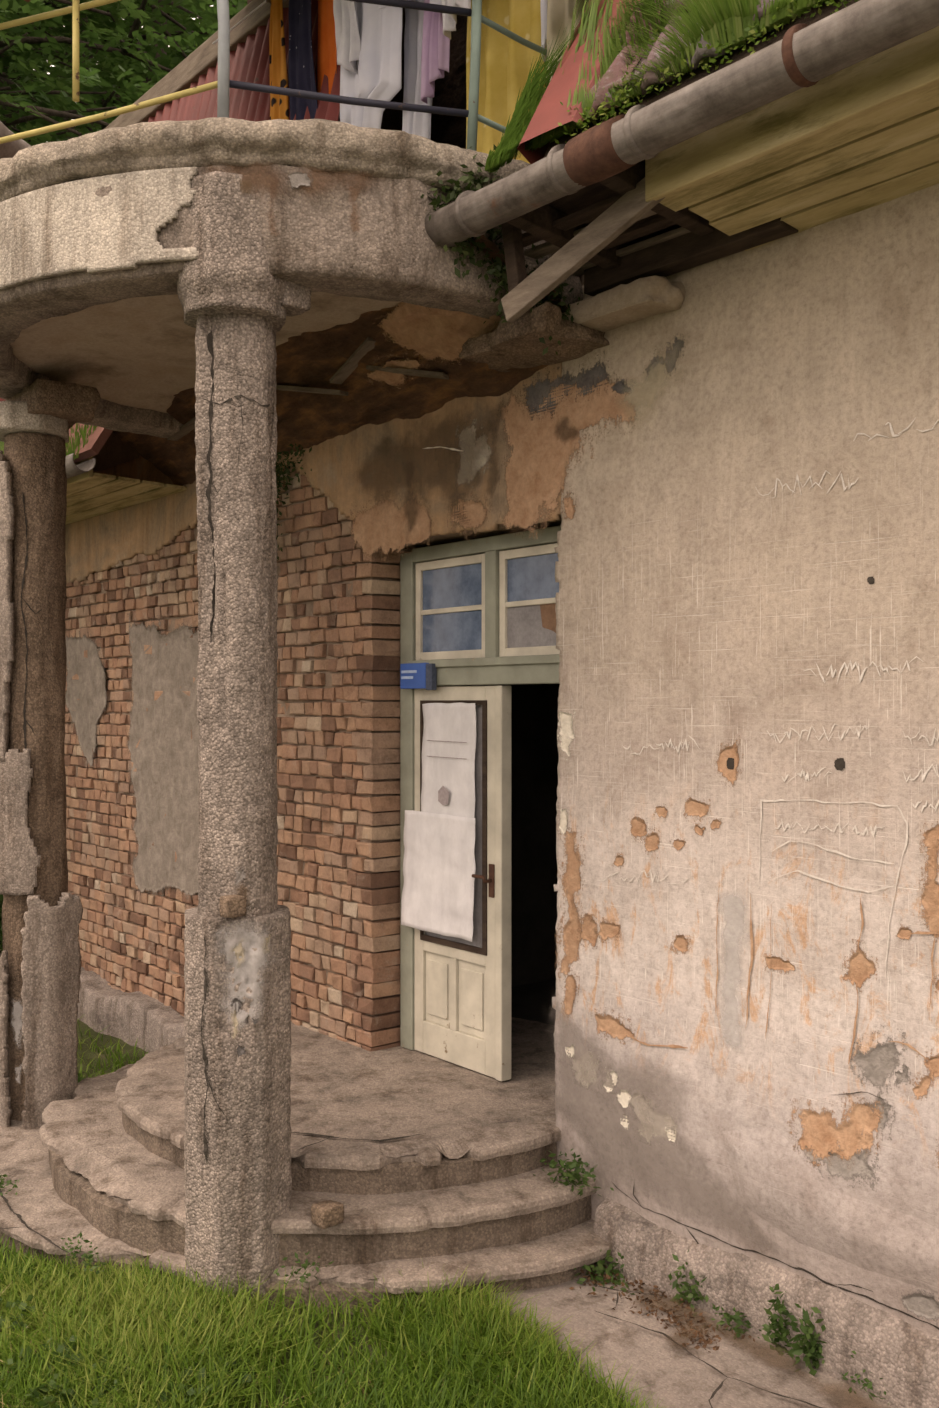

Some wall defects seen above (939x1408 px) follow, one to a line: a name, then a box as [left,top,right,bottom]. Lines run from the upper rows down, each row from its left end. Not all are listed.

spalling [288,172,313,191]
peeling [349,351,637,560]
crack [199,326,270,639]
peeling [557,711,576,761]
peeling [716,740,741,785]
peeling [555,808,621,1018]
peeling [764,954,795,973]
spalling [12,1002,22,1040]
peeling [591,1007,688,1048]
peeling [788,898,939,1192]
crack [611,1181,939,1330]